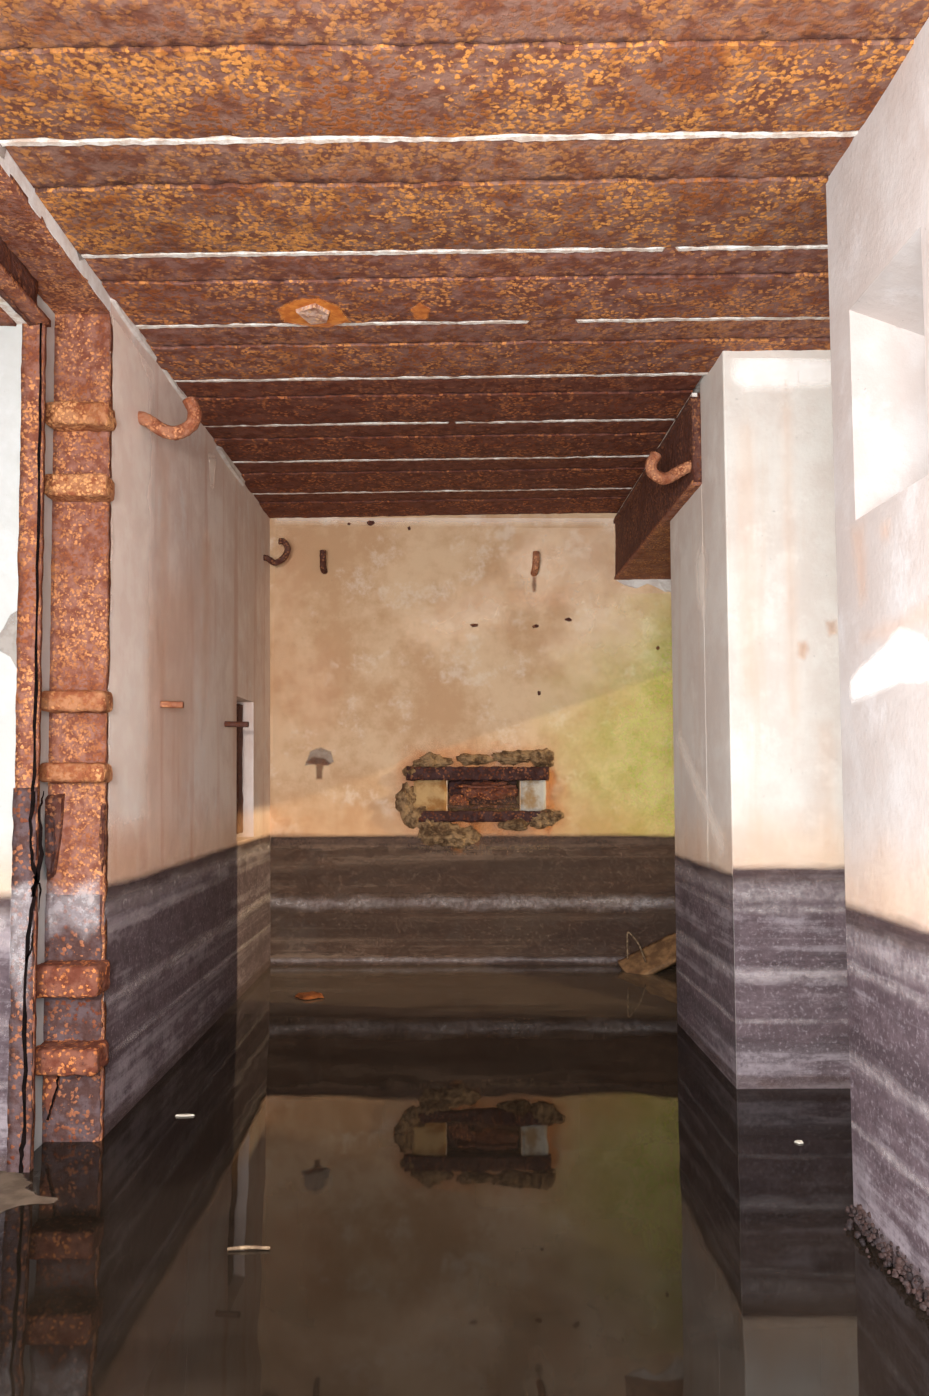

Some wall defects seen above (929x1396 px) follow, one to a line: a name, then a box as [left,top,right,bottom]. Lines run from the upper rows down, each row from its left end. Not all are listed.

corrosion [277,298,349,328]
corrosion [410,302,431,320]
crack [19,323,44,1173]
corrosion [45,793,65,881]
corrosion [42,1075,60,1121]